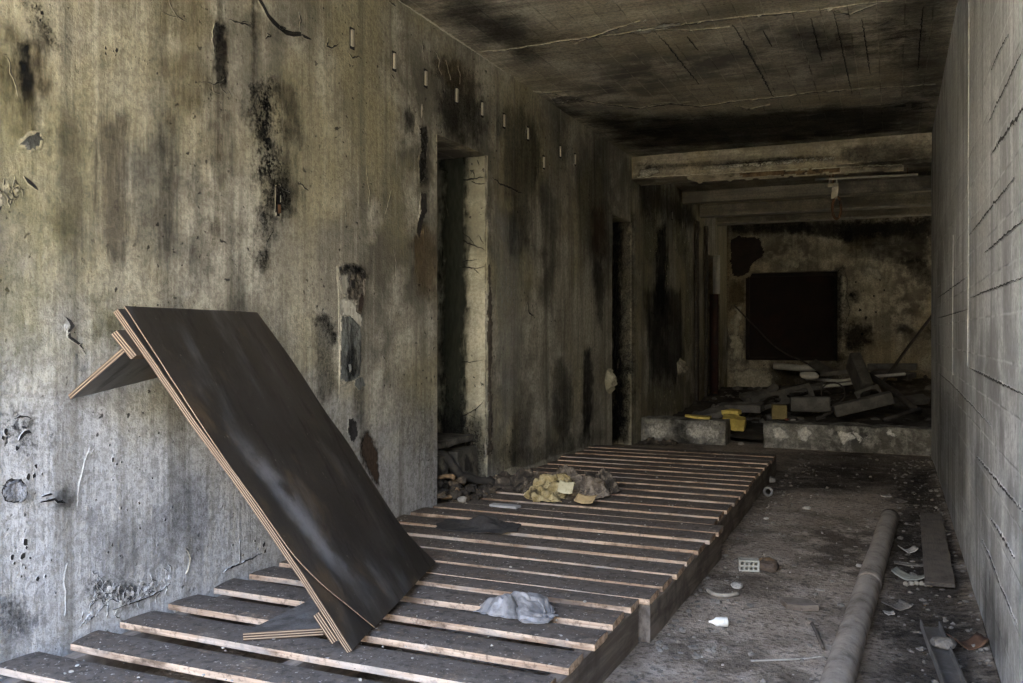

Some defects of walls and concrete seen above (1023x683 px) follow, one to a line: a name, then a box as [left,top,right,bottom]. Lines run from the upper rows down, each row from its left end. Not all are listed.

crack [211,0,362,60]
crack [388,0,935,110]
crack [988,34,1023,155]
spalling [16,129,46,155]
flaking render [0,175,38,210]
crack [969,177,1023,253]
crack [938,277,1023,318]
spalling [336,262,368,391]
hole [0,427,32,451]
spalling [1,464,43,503]
corrosion [360,431,379,485]
crack [976,456,1023,512]